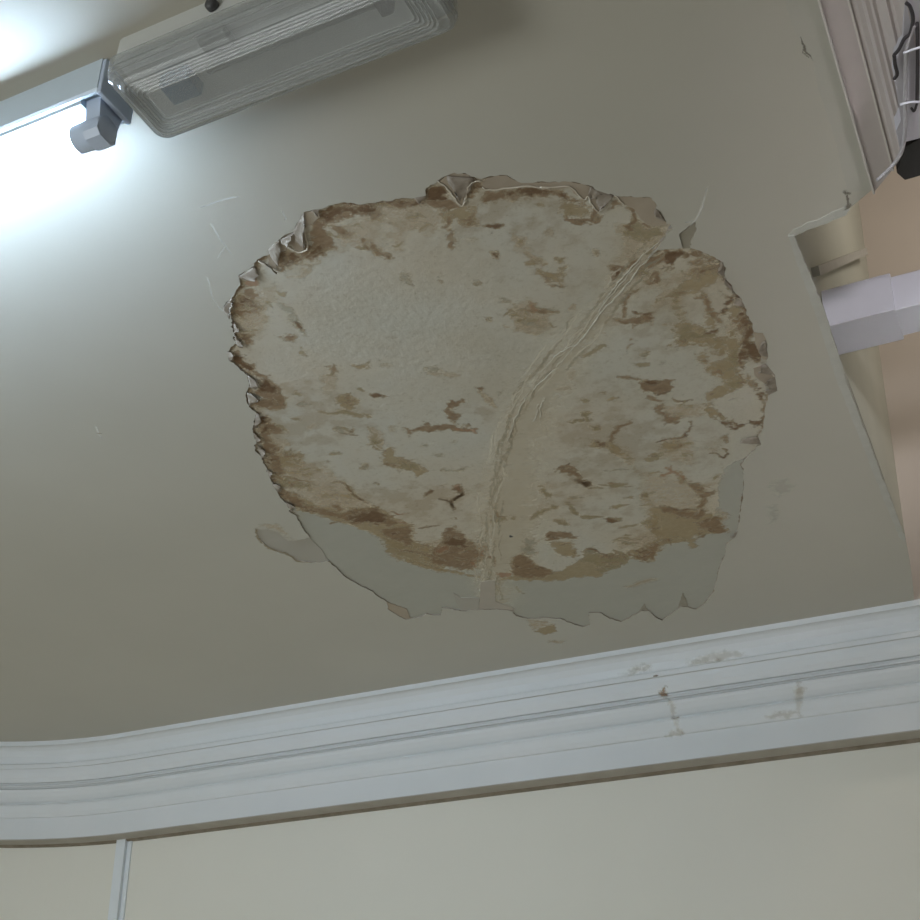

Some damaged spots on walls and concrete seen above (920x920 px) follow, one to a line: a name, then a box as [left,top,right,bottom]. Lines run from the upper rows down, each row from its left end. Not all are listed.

damp [276,182,602,272]
damp [224,256,729,582]
peeling [223,173,777,626]
crack [480,243,658,601]
damp [607,200,768,459]